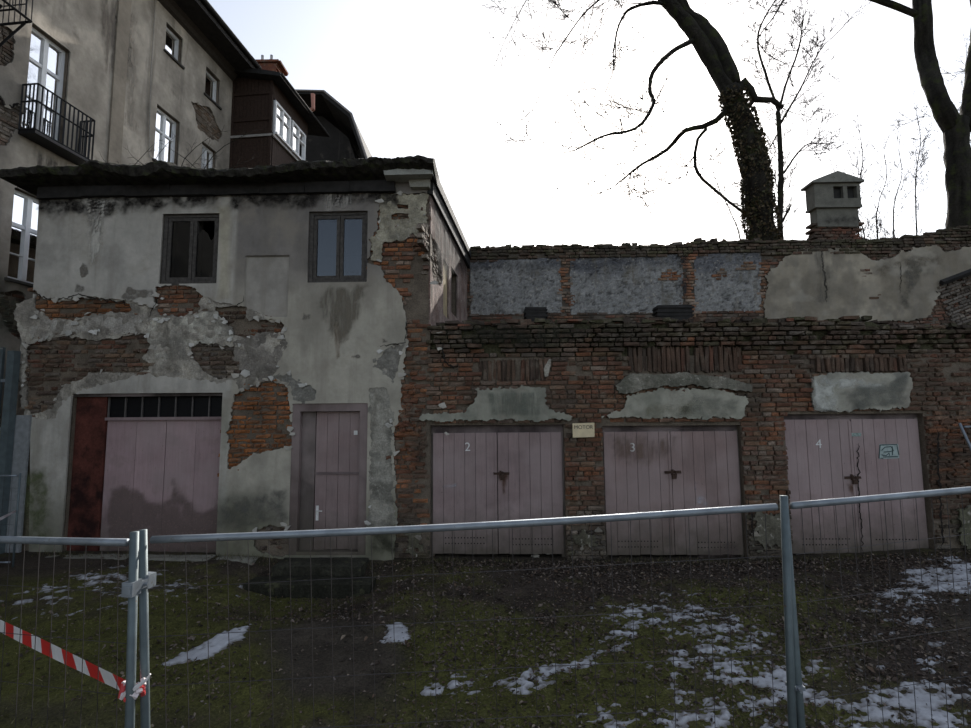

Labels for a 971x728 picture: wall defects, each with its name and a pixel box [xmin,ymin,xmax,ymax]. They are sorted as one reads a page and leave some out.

flaking render [0,26,14,66]
flaking render [191,102,221,141]
flaking render [366,191,444,305]
damp [322,286,362,342]
flaking render [0,265,316,477]
flaking render [373,319,443,557]
flaking render [252,522,291,550]
crack [856,443,864,551]